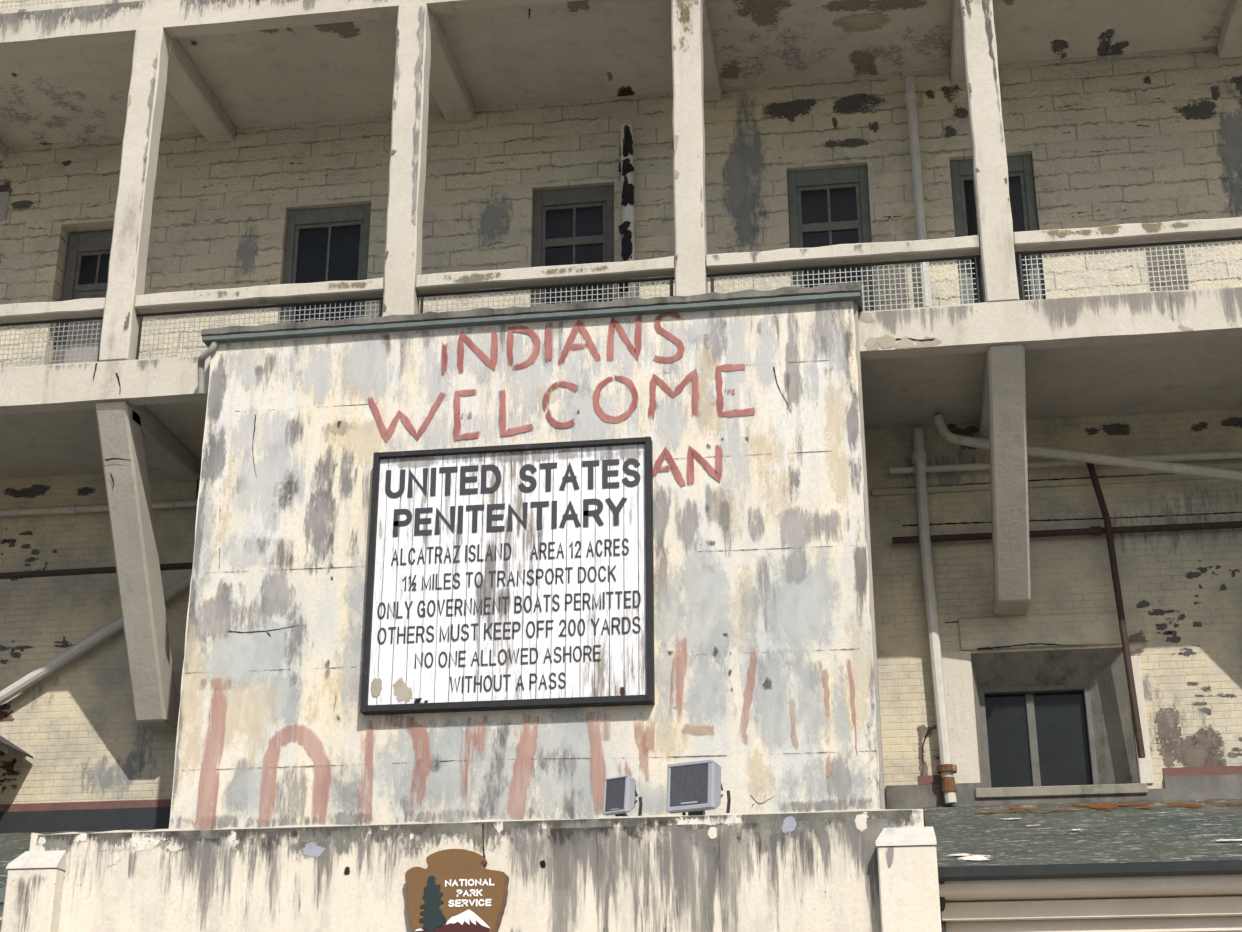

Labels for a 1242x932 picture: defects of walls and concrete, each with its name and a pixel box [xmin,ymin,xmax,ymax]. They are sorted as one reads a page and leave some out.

leakage [0,0,144,33]
leakage [181,0,314,10]
peeling [761,99,817,124]
peeling [823,93,889,148]
peeling [925,83,972,137]
peeling [1173,76,1242,120]
leakage [722,98,766,262]
leakage [184,357,306,684]
crack [227,626,294,636]
peeling [1128,560,1240,657]
peeling [1143,678,1242,768]
leakage [37,725,914,932]